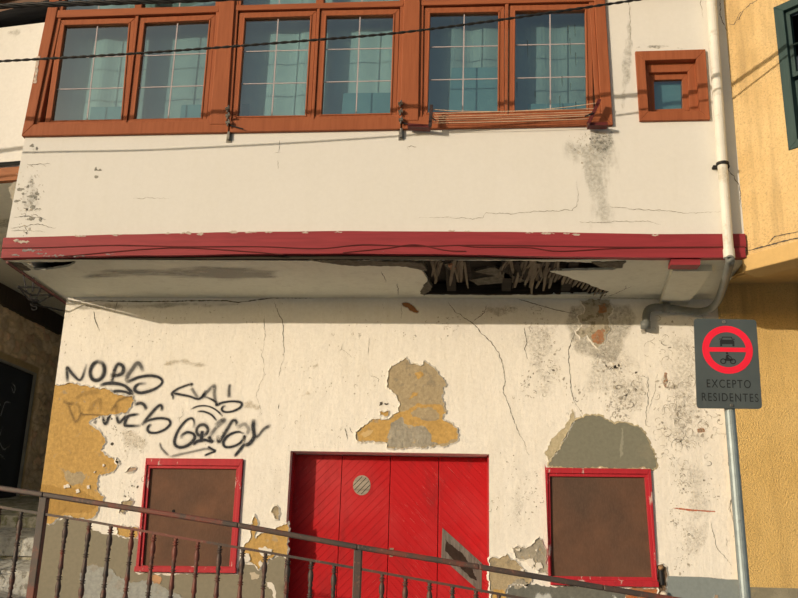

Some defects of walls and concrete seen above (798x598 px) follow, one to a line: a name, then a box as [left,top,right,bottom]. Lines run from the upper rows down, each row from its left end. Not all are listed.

leakage [14,181,42,222]
peeling [41,381,138,525]
crack [65,298,285,403]
peeling [354,356,460,451]
crack [449,304,526,446]
spalling [543,409,576,462]
spalling [574,299,614,349]
peeling [240,504,291,598]
peeling [486,536,548,598]